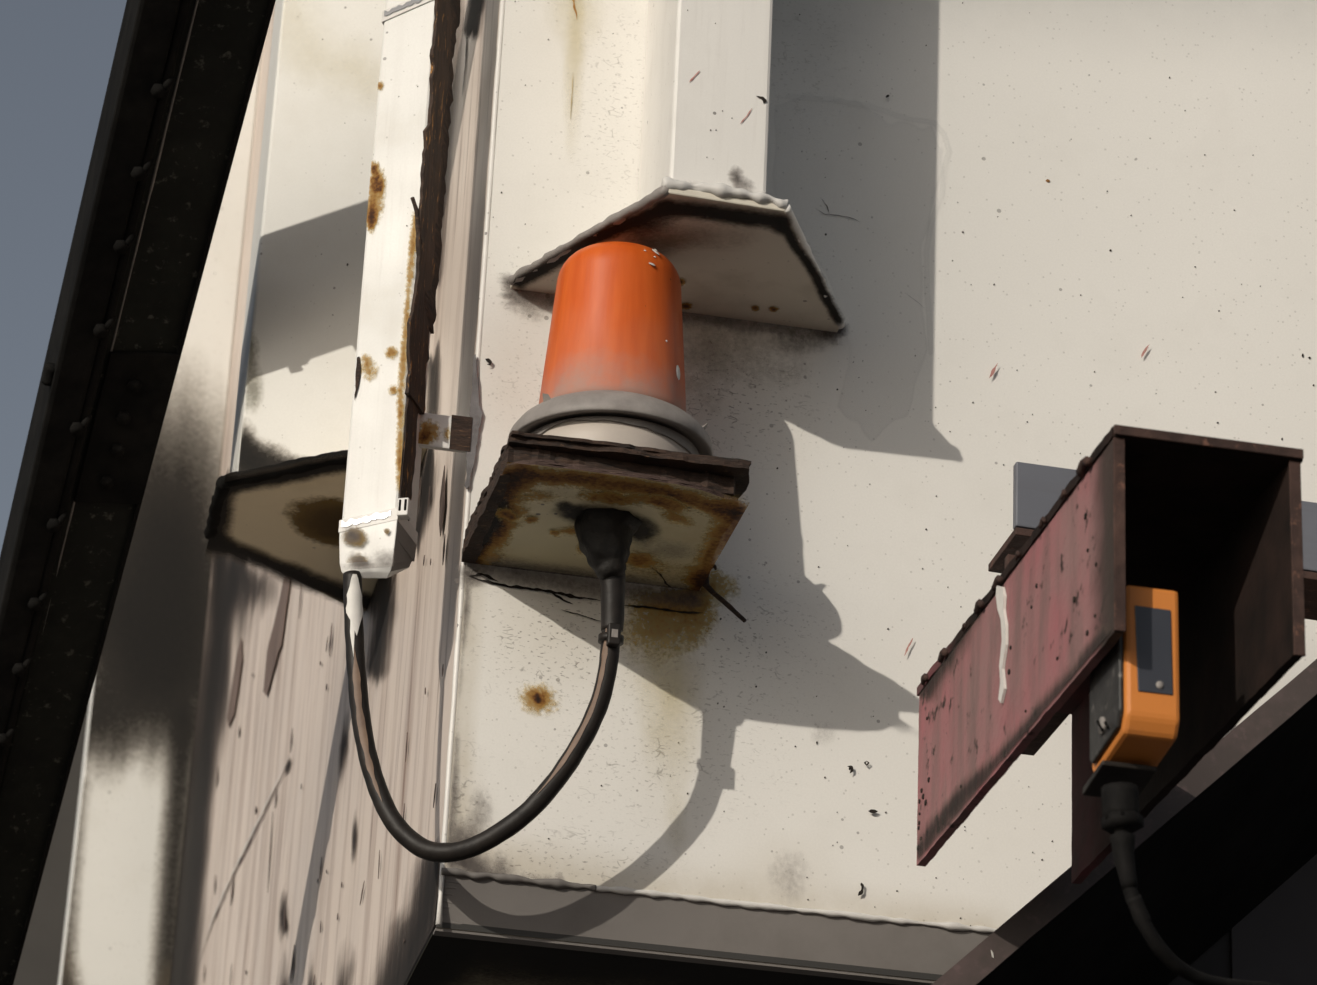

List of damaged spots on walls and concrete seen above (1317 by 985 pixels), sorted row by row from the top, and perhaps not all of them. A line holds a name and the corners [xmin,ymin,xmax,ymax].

corrosion [366,161,385,231]
corrosion [362,212,449,487]
corrosion [461,430,751,657]
crack [469,568,701,621]
corrosion [521,686,556,712]